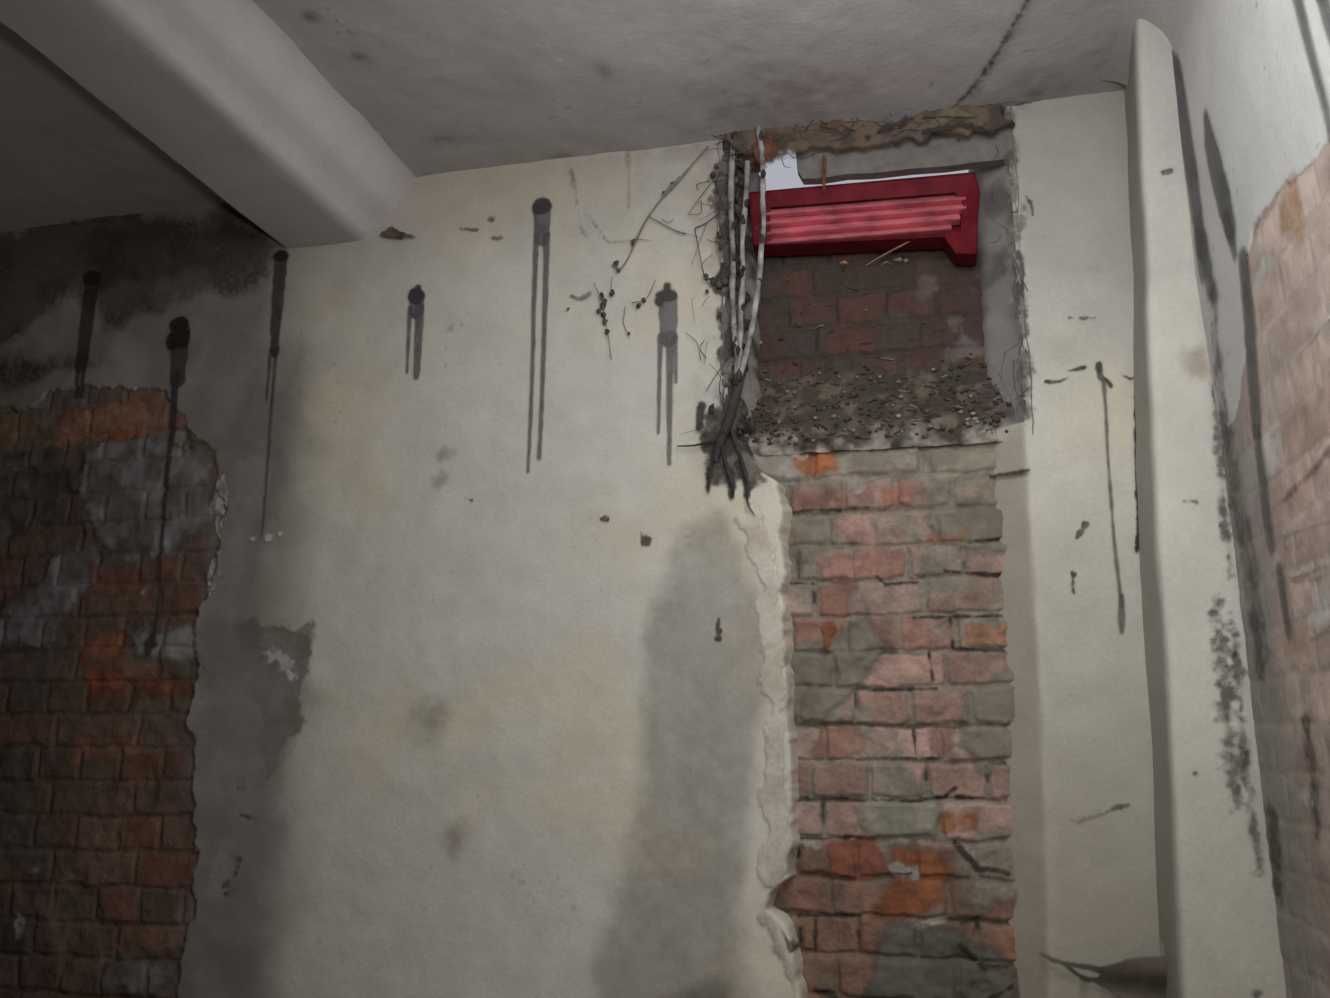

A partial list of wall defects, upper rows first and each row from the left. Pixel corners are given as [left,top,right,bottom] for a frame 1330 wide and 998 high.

flaking render [724,104,1012,165]
crack [956,35,1011,106]
leakage [1293,0,1330,141]
leakage [406,285,425,379]
leakage [527,198,552,472]
leakage [655,282,678,465]
leakage [1172,51,1289,802]
flaking render [0,385,229,998]
leakage [0,208,315,998]
flaking render [735,417,1019,998]
flaking render [1222,143,1330,998]
leakage [1249,809,1282,902]